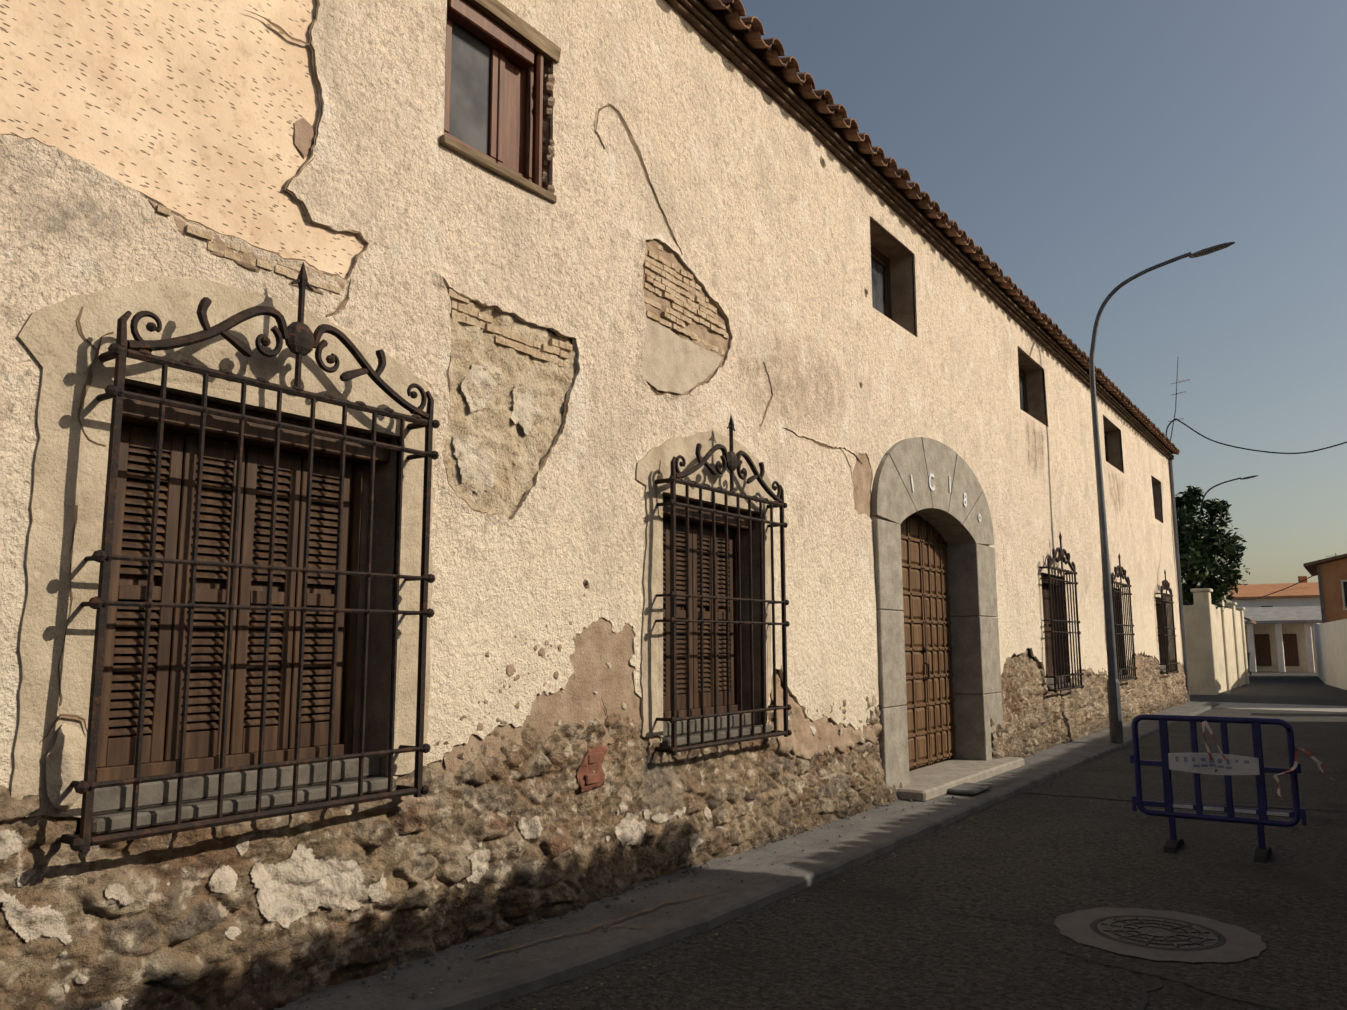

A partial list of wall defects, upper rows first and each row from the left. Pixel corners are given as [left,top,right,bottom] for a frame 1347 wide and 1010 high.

spalling [0,0,369,317]
crack [594,102,683,255]
spalling [641,239,732,397]
spalling [442,282,578,520]
peeling [441,617,661,792]
peeling [770,671,882,760]
peeling [209,838,249,894]
peeling [225,926,242,940]
peeling [368,877,387,902]
peeling [637,809,650,833]
peeling [689,833,703,852]
peeling [63,973,88,993]